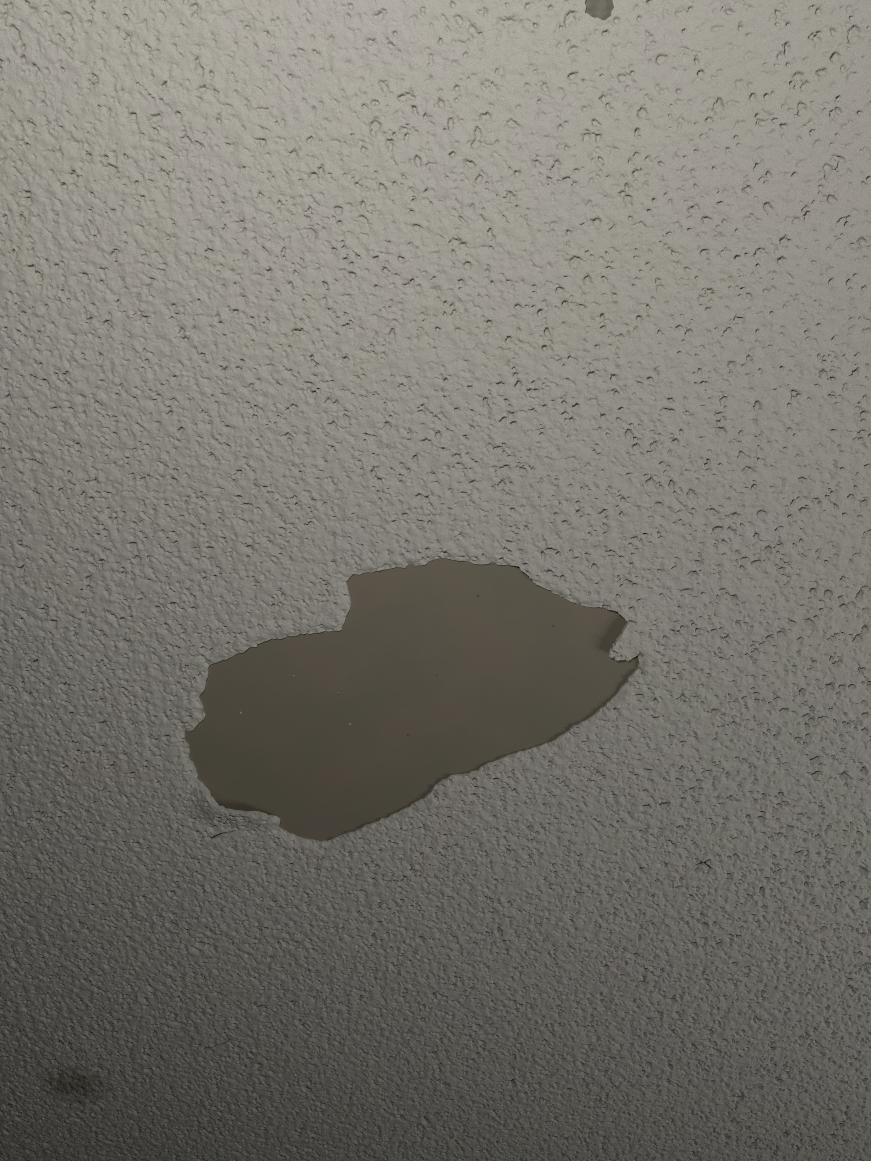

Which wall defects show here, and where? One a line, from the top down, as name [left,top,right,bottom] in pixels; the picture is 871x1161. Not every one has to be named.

spalling [585,0,614,21]
peeling [184,558,650,842]